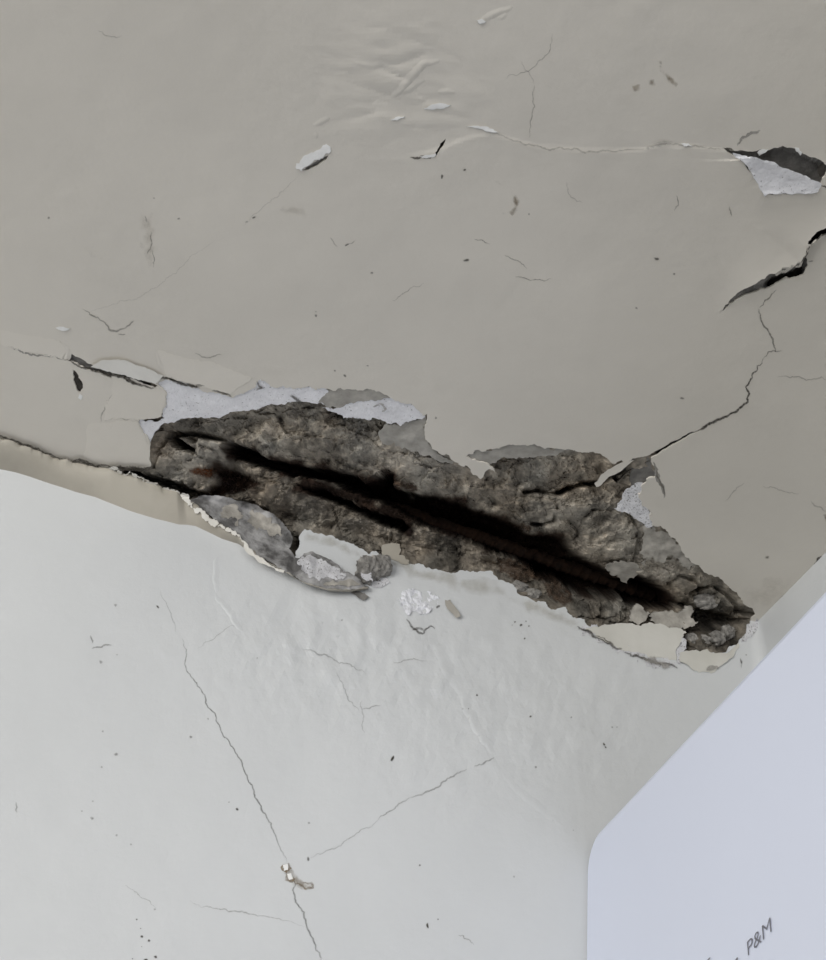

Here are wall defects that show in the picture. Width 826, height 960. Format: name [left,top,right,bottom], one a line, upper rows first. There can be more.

peeling [296,144,331,171]
peeling [725,132,826,196]
crack [724,228,826,342]
crack [610,363,762,495]
spalling [0,326,755,673]